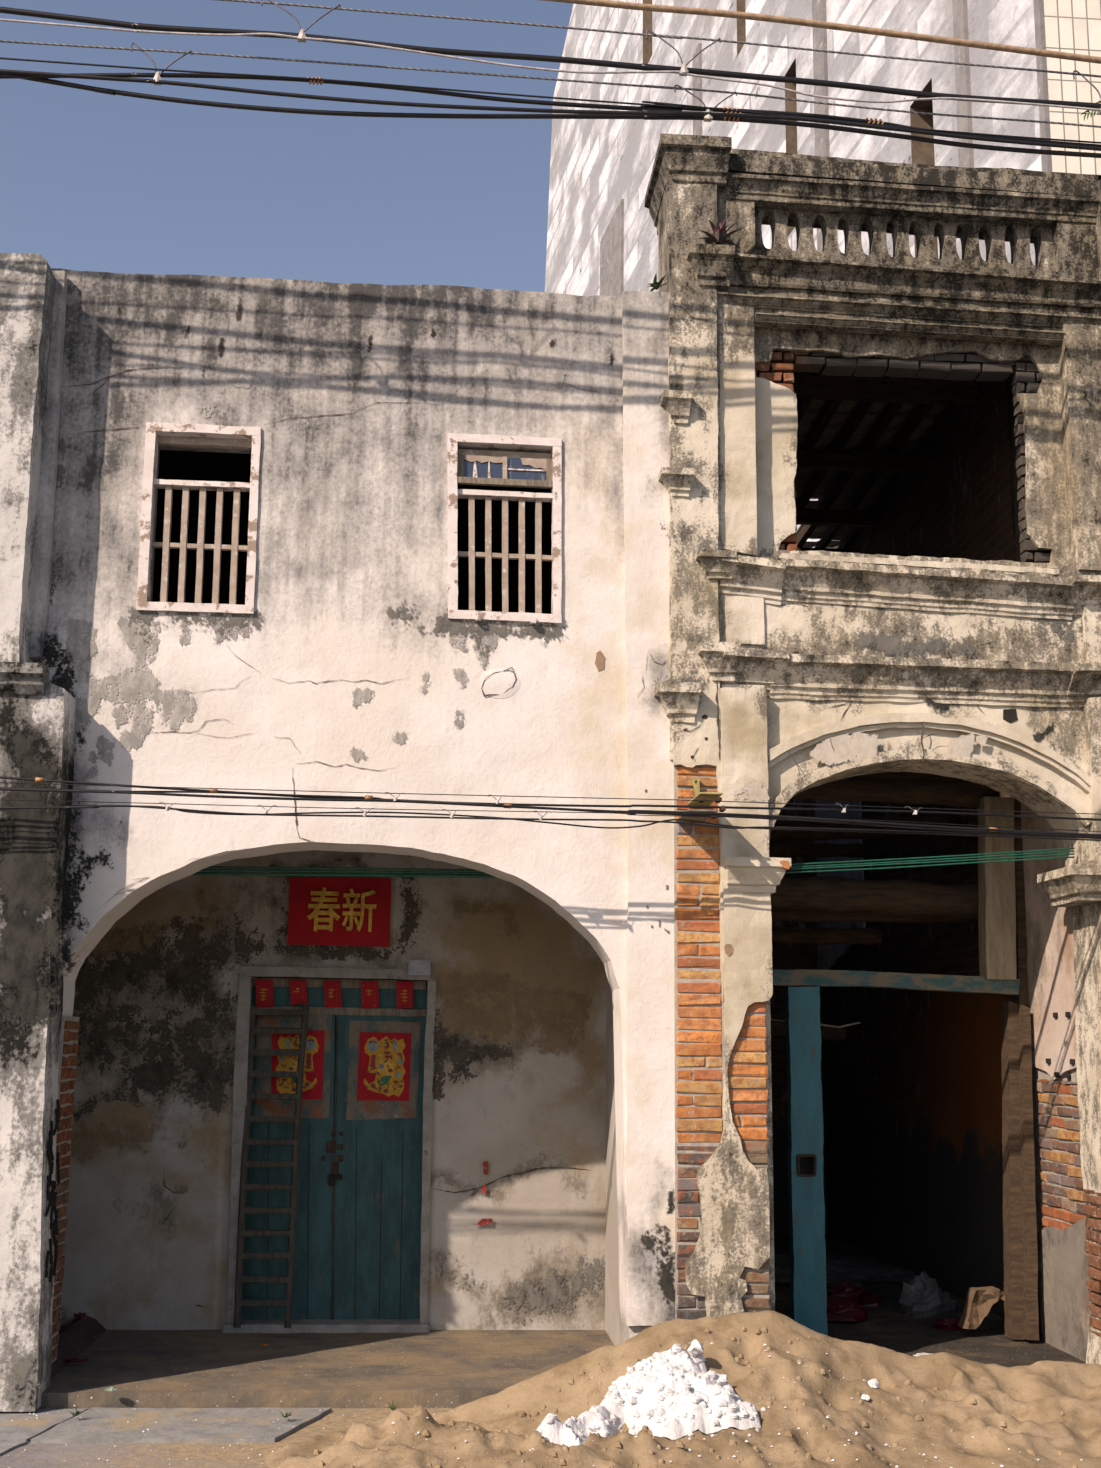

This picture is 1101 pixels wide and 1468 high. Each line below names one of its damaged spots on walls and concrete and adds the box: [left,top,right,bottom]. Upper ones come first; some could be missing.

water stain [33,628,77,698]
crack [154,645,411,844]
water stain [651,670,709,699]
peeling [810,731,878,766]
peeling [950,733,988,758]
water stain [0,725,274,1163]
water stain [432,972,589,1101]
flaking render [646,755,771,1320]
flaking render [50,1016,106,1381]
crack [432,1167,588,1196]
flaking render [1035,1079,1101,1338]
water stain [497,1255,605,1325]